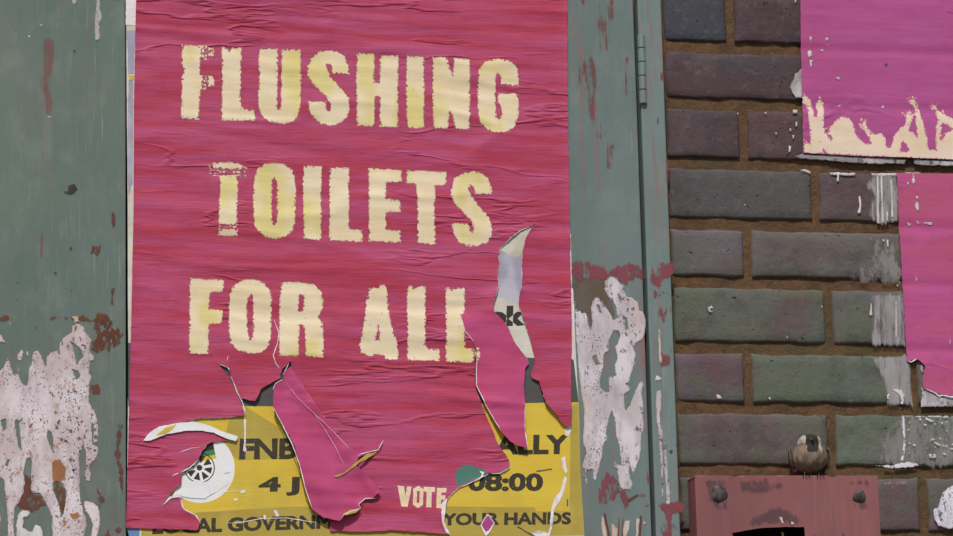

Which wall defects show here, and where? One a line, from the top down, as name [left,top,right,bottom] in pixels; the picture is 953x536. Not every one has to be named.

peeling [0,316,100,536]
rust [51,288,123,352]
rust [114,425,123,491]
peeling [571,261,675,510]
peeling [655,308,684,536]